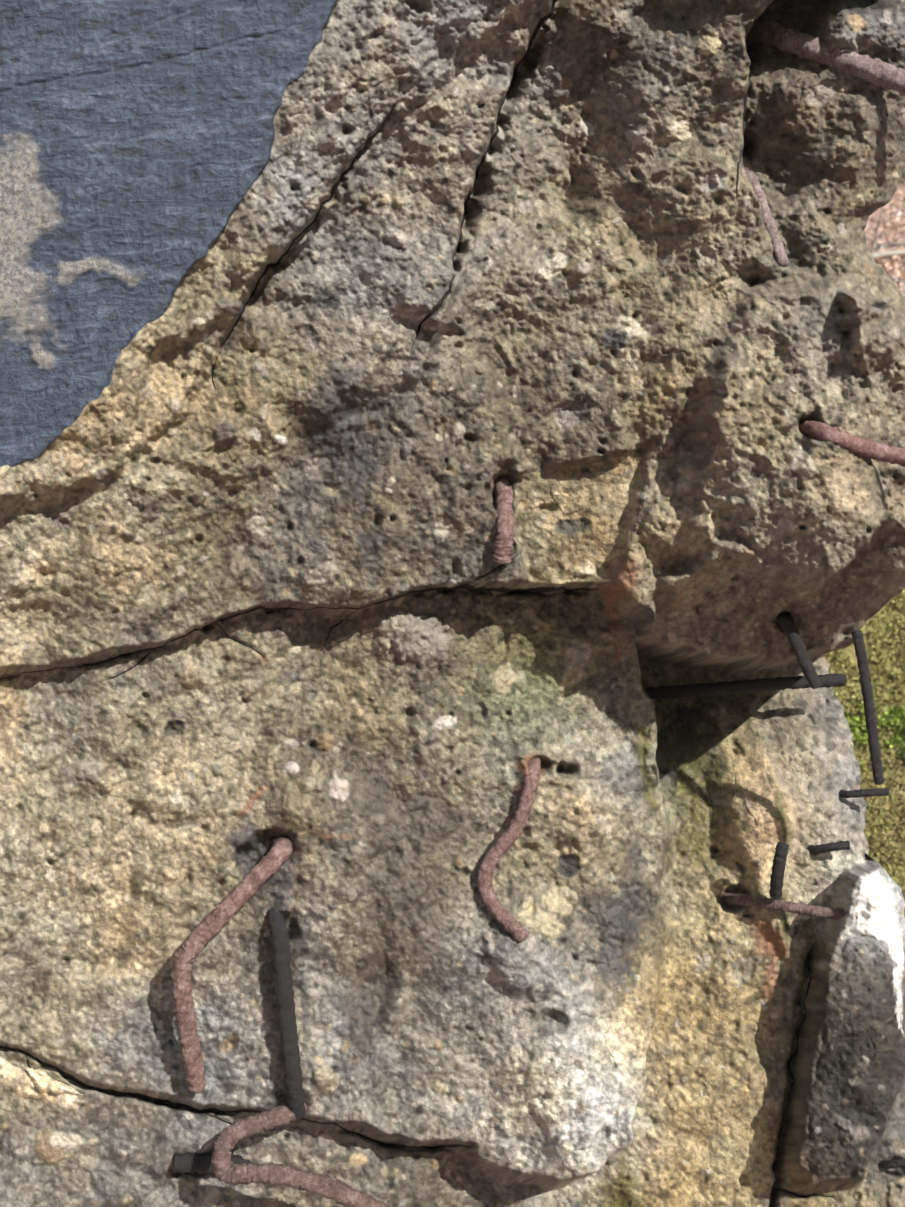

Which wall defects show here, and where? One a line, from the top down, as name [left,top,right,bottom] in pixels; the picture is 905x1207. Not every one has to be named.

crack [212,106,394,389]
crack [411,0,557,350]
spalling [742,150,789,267]
spalling [746,0,905,227]
crack [0,553,600,682]
spalling [646,612,889,944]
crack [0,1046,265,1135]
crack [300,1118,470,1149]
crack [769,964,831,1207]